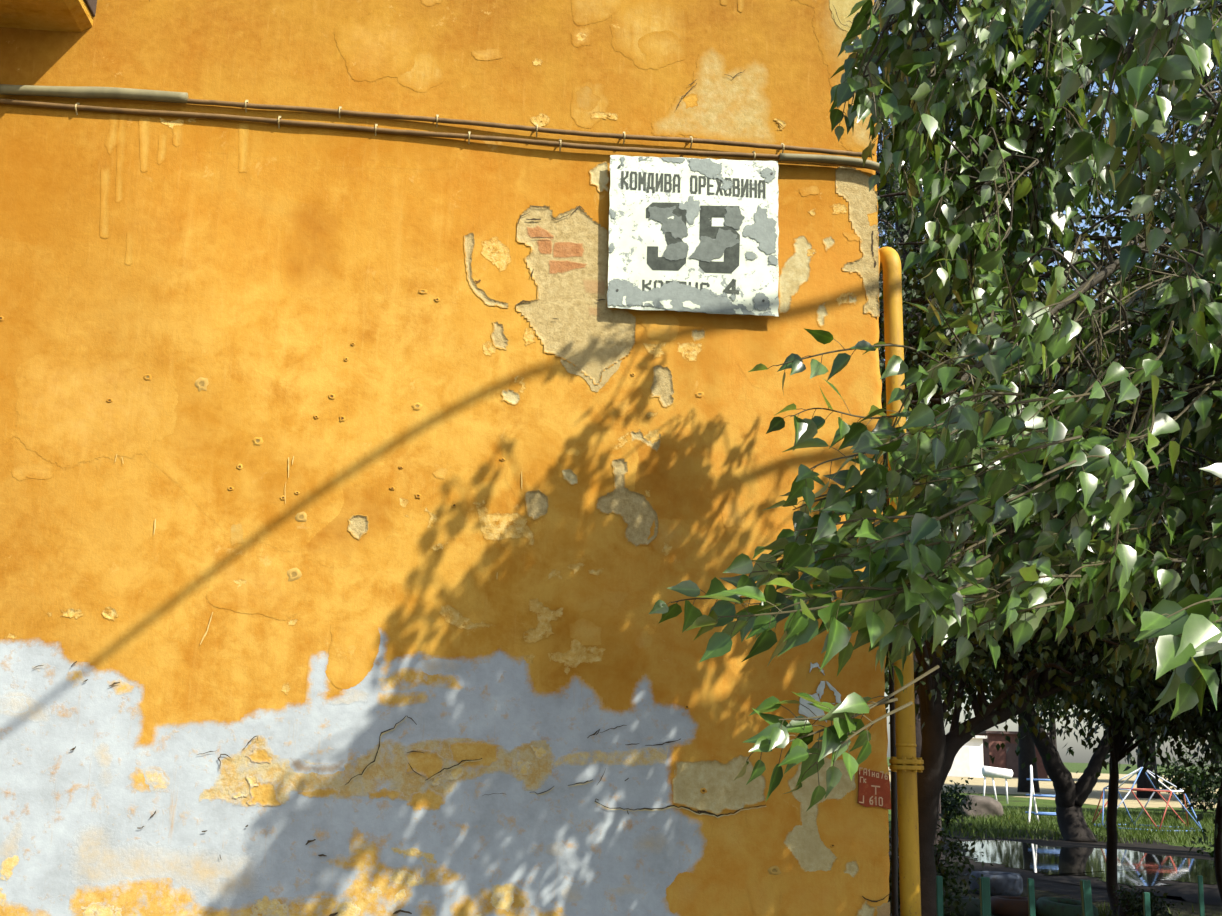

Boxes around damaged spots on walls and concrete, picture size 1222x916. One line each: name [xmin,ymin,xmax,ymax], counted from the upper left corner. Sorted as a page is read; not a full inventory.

spalling [570,0,786,145]
peeling [792,0,870,88]
peeling [836,94,876,154]
spalling [778,166,880,327]
spalling [463,204,708,556]
peeling [206,524,309,626]
peeling [325,614,464,708]
peeling [93,742,170,793]
crack [345,716,483,786]
spalling [198,735,770,857]
crack [486,768,766,818]
peeling [720,756,890,916]